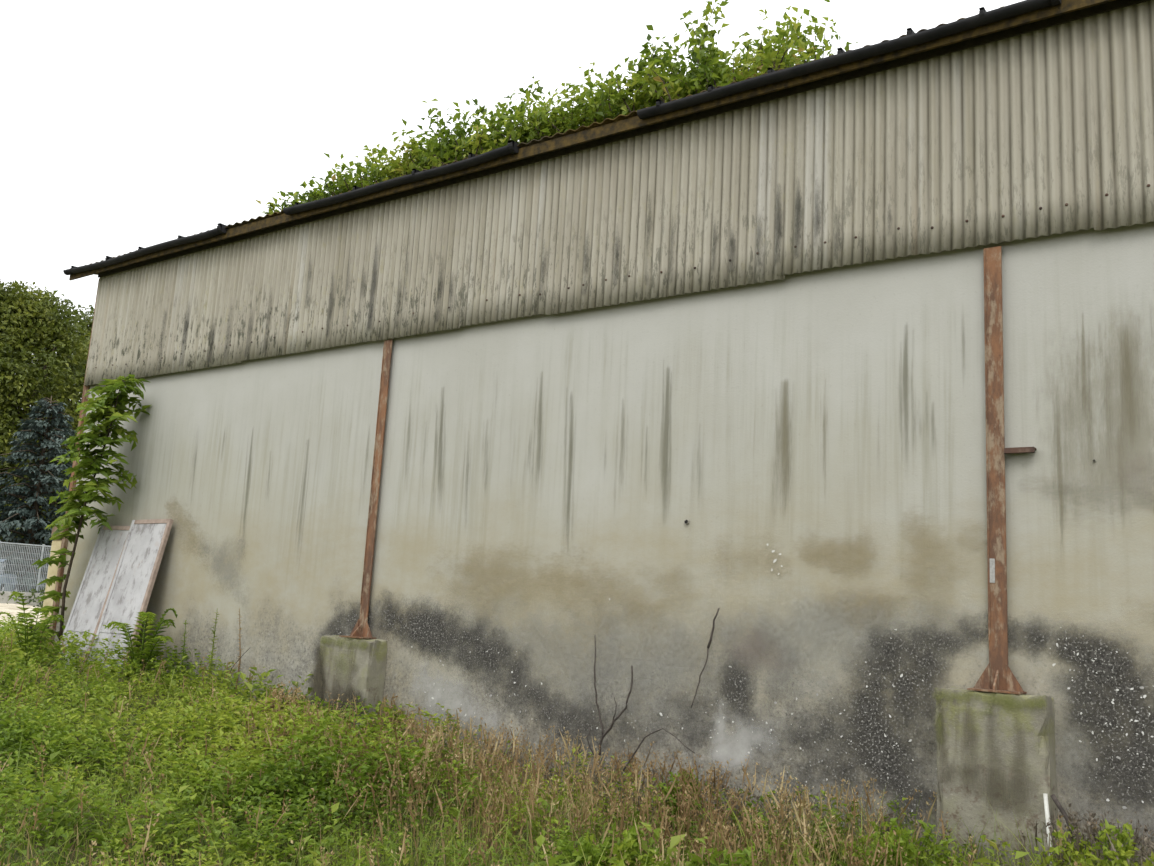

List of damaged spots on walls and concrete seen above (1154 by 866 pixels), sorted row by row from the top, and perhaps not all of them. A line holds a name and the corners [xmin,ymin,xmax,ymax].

damp [367,262,376,329]
damp [310,597,647,760]
damp [660,624,988,823]
damp [1008,623,1154,809]